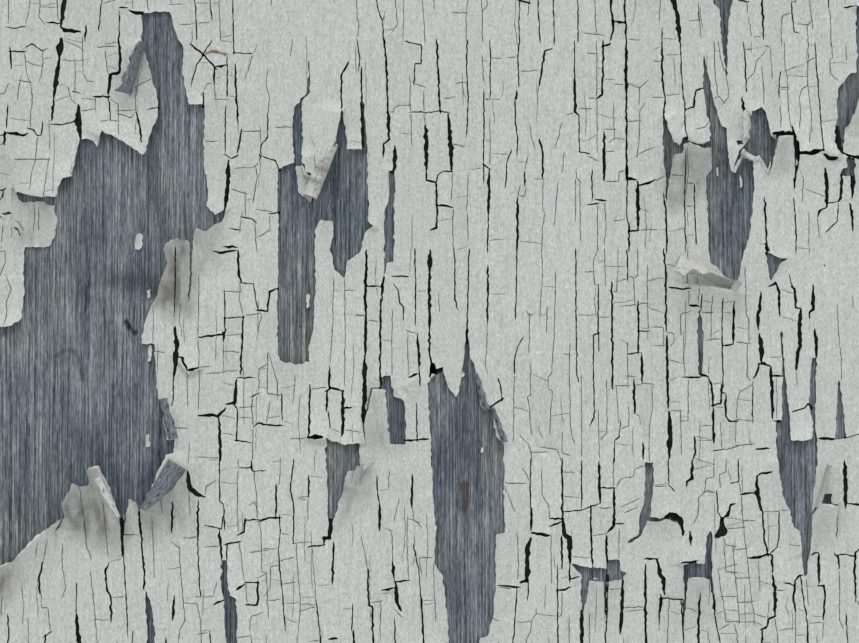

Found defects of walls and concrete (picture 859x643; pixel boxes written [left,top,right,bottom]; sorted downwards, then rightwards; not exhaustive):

peeling [0,0,229,643]
crack [0,0,443,643]
peeling [238,62,373,395]
peeling [383,171,396,289]
peeling [420,314,532,643]
crack [376,0,859,643]
peeling [628,0,782,385]
peeling [765,253,788,281]
peeling [810,0,859,202]